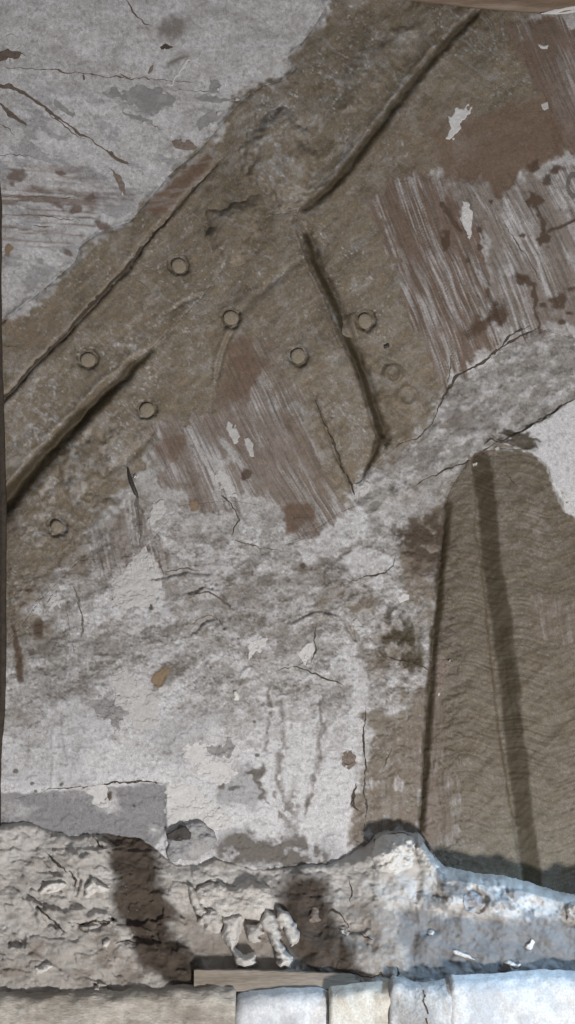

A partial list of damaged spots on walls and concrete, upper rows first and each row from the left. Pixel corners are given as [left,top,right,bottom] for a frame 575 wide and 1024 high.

peeling [541,6,575,14]
crack [0,66,238,166]
peeling [103,58,192,130]
peeling [446,103,472,140]
peeling [460,201,473,239]
crack [386,325,536,456]
peeling [226,421,254,457]
crack [413,399,575,487]
corrosion [151,666,170,688]
damp [378,503,452,832]
damp [472,452,541,886]
crack [350,704,392,826]